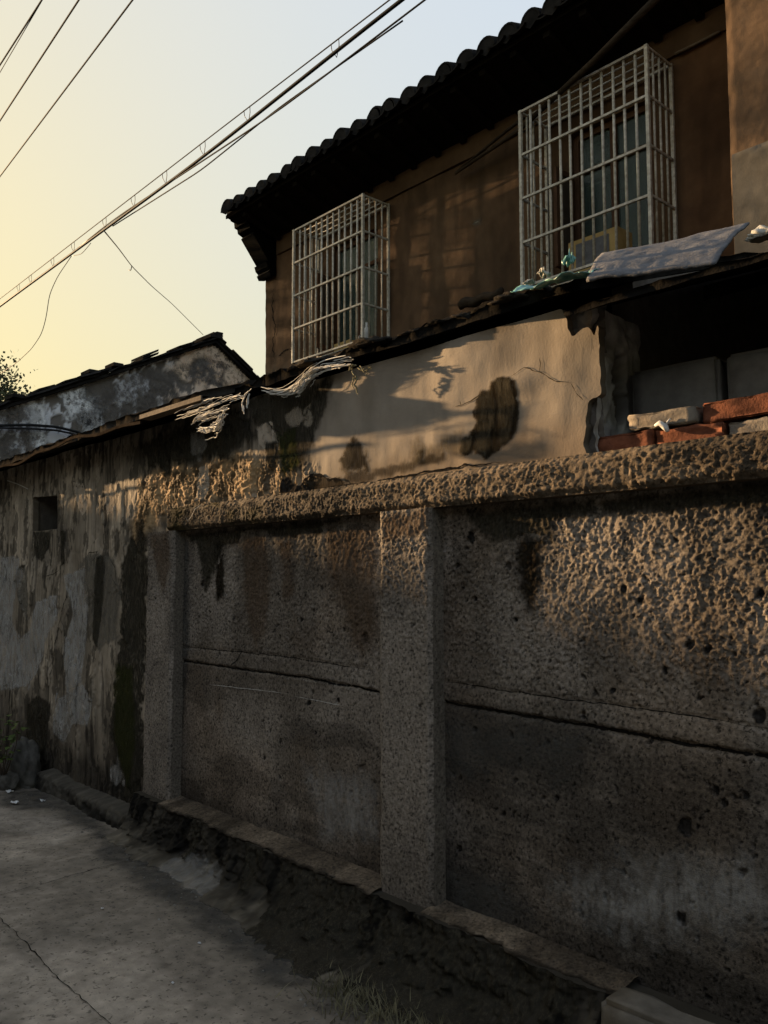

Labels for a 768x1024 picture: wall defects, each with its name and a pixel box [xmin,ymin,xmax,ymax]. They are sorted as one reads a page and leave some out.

spalling [569,305,607,353]
peeling [167,346,246,385]
crack [509,359,582,399]
peeling [28,404,47,447]
peeling [60,388,104,431]
water stain [417,377,519,462]
spalling [589,398,605,453]
water stain [34,531,65,566]
water stain [92,556,105,648]
water stain [182,515,372,692]
water stain [110,515,148,803]